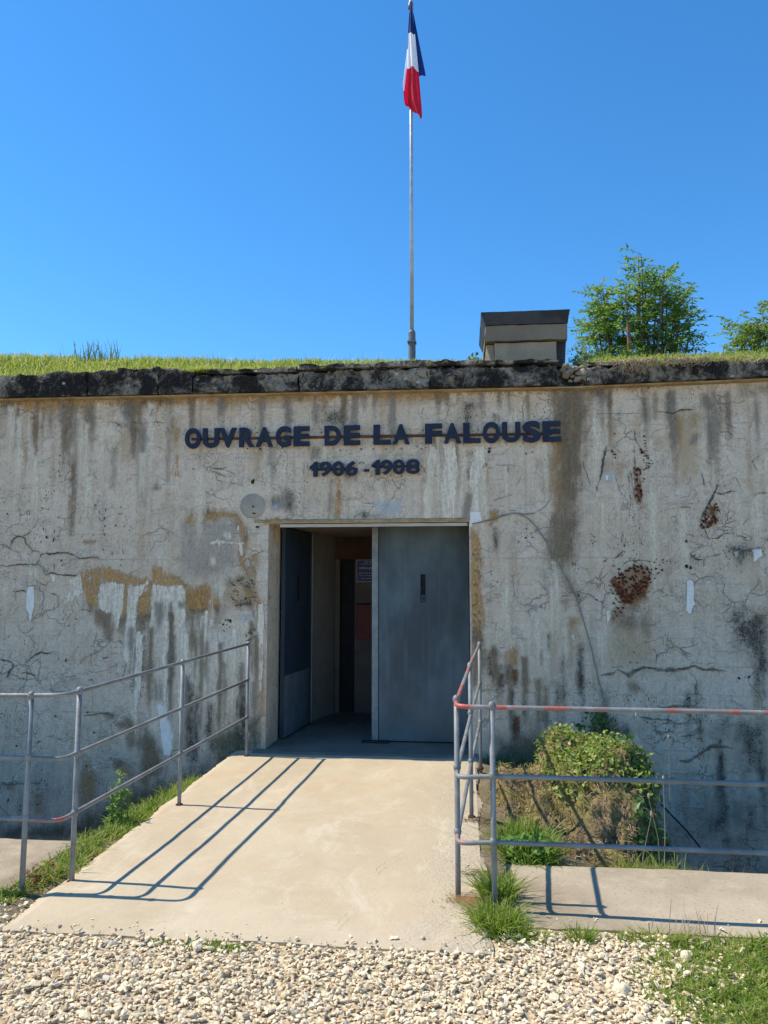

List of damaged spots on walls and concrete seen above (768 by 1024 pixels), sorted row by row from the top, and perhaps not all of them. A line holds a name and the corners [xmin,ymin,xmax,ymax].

crack [0,527,125,728]
peeling [98,541,257,756]
damp [0,386,731,766]
rust [596,558,671,619]
crack [582,409,694,509]
crack [601,625,726,678]
crack [672,424,765,566]
damp [729,454,768,564]